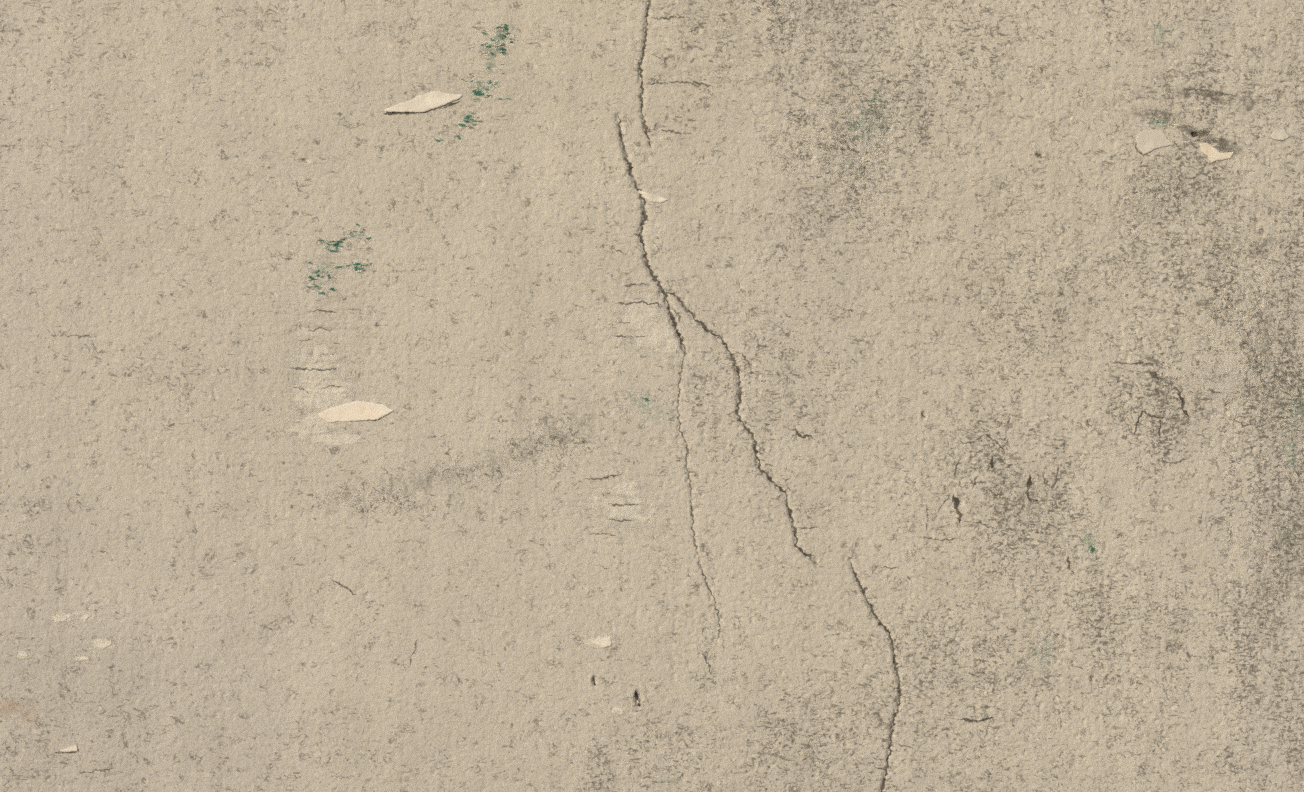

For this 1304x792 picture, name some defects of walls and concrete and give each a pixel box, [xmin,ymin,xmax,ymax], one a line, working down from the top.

peeling [383,91,463,115]
peeling [1136,129,1174,154]
peeling [1199,143,1234,163]
crack [611,0,817,673]
peeling [295,398,393,445]
crack [850,562,912,792]